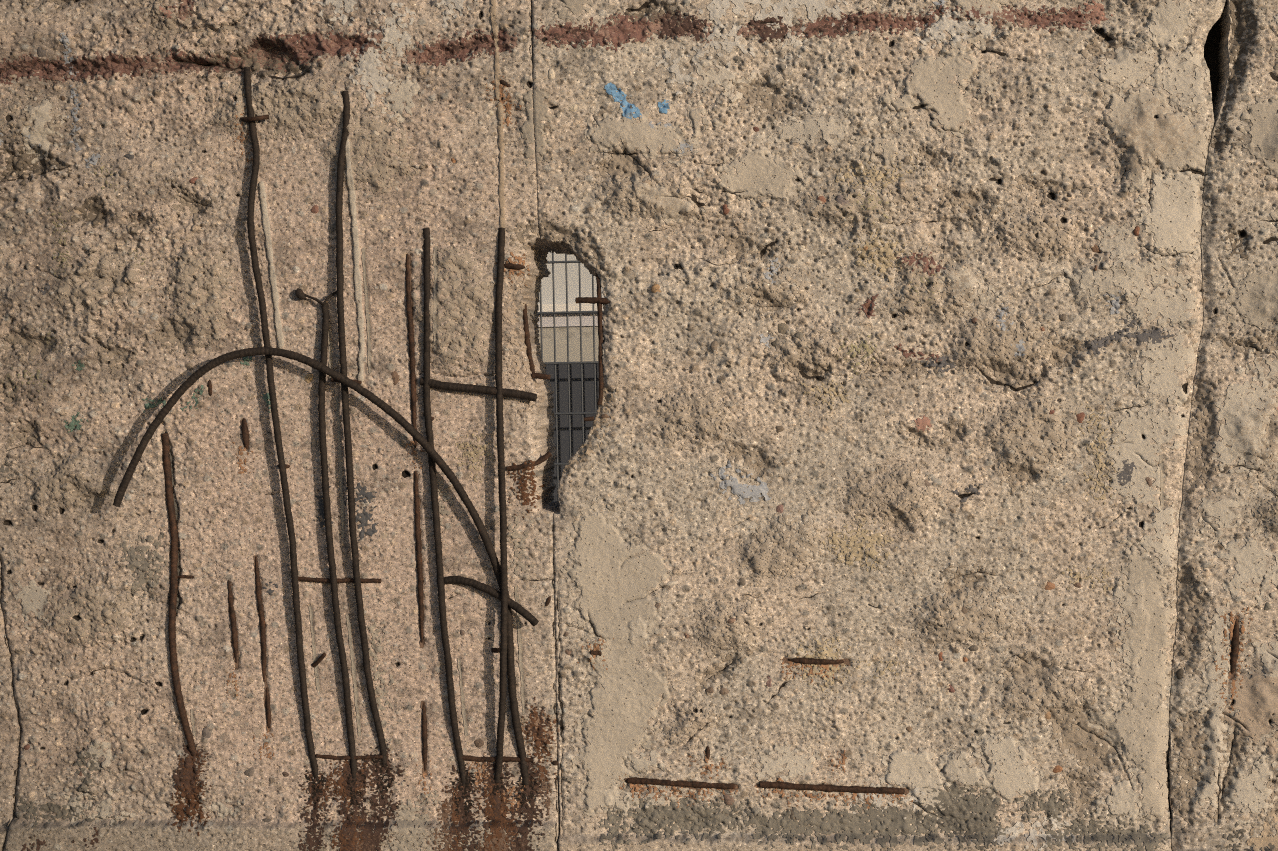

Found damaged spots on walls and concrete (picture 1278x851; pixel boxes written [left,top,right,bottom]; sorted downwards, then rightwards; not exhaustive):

rust [486,76,522,136]
crack [1120,169,1208,206]
crack [1263,220,1278,244]
crack [1140,246,1234,287]
spalling [0,0,620,787]
rust [507,460,546,521]
rust [781,650,847,683]
rust [1214,606,1254,714]
rust [163,738,212,836]
rust [290,697,562,851]
rust [619,747,913,811]
crack [1217,714,1247,822]